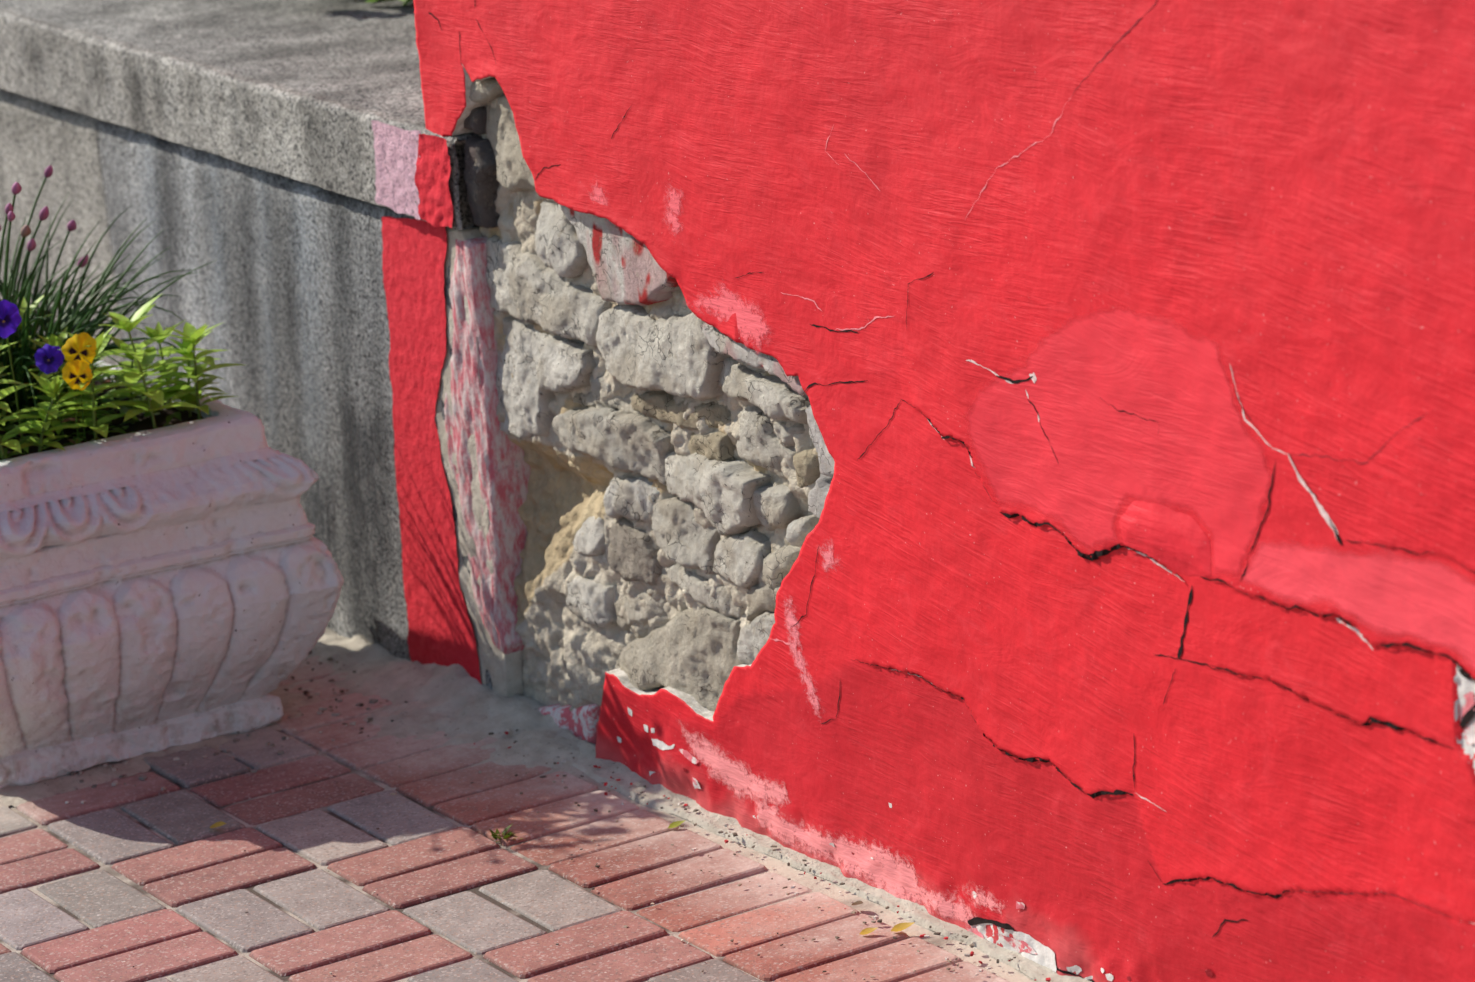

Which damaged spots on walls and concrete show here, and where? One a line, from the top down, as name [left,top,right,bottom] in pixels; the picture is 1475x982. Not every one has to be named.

crack [965,0,1157,219]
crack [736,272,934,333]
spalling [434,78,835,744]
crack [801,380,868,396]
crack [858,360,1475,749]
peeling [628,708,701,789]
crack [772,547,1165,811]
peeling [1454,663,1475,768]
crack [1150,864,1475,939]
crack [1056,967,1094,982]